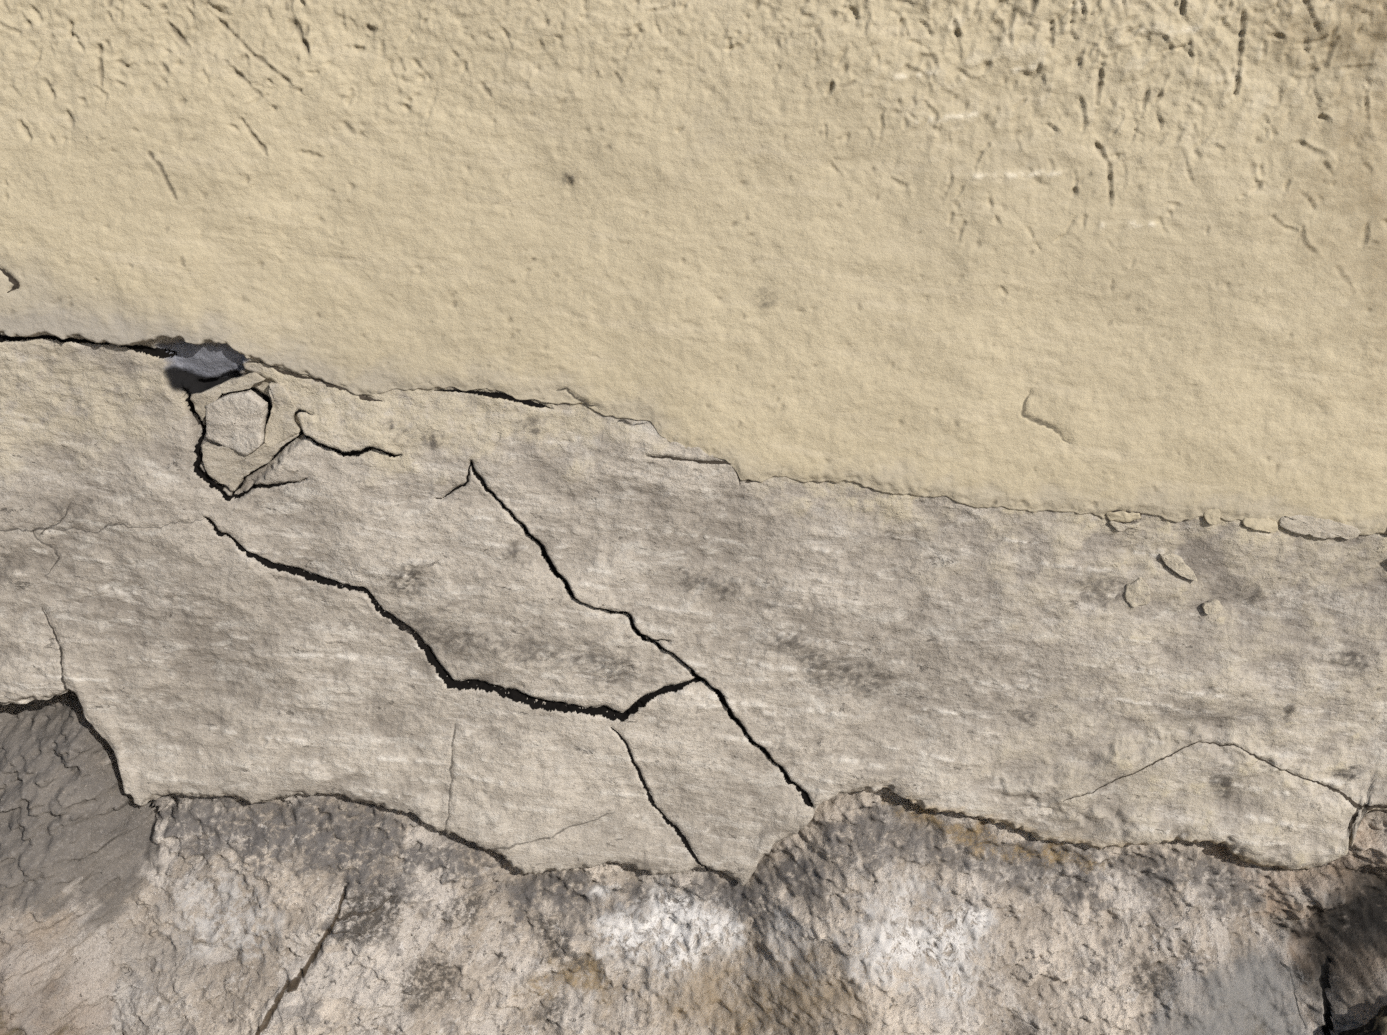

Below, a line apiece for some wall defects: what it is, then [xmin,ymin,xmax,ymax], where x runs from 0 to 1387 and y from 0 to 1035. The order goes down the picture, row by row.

crack [0,335,177,358]
spalling [158,341,302,491]
crack [42,607,73,695]
crack [185,361,816,871]
peeling [1106,511,1141,531]
peeling [1160,553,1197,582]
peeling [1202,599,1223,615]
spalling [0,690,502,940]
spalling [508,807,1263,937]
peeling [1021,798,1053,818]
crack [1063,741,1387,880]
damp [1182,876,1387,1035]